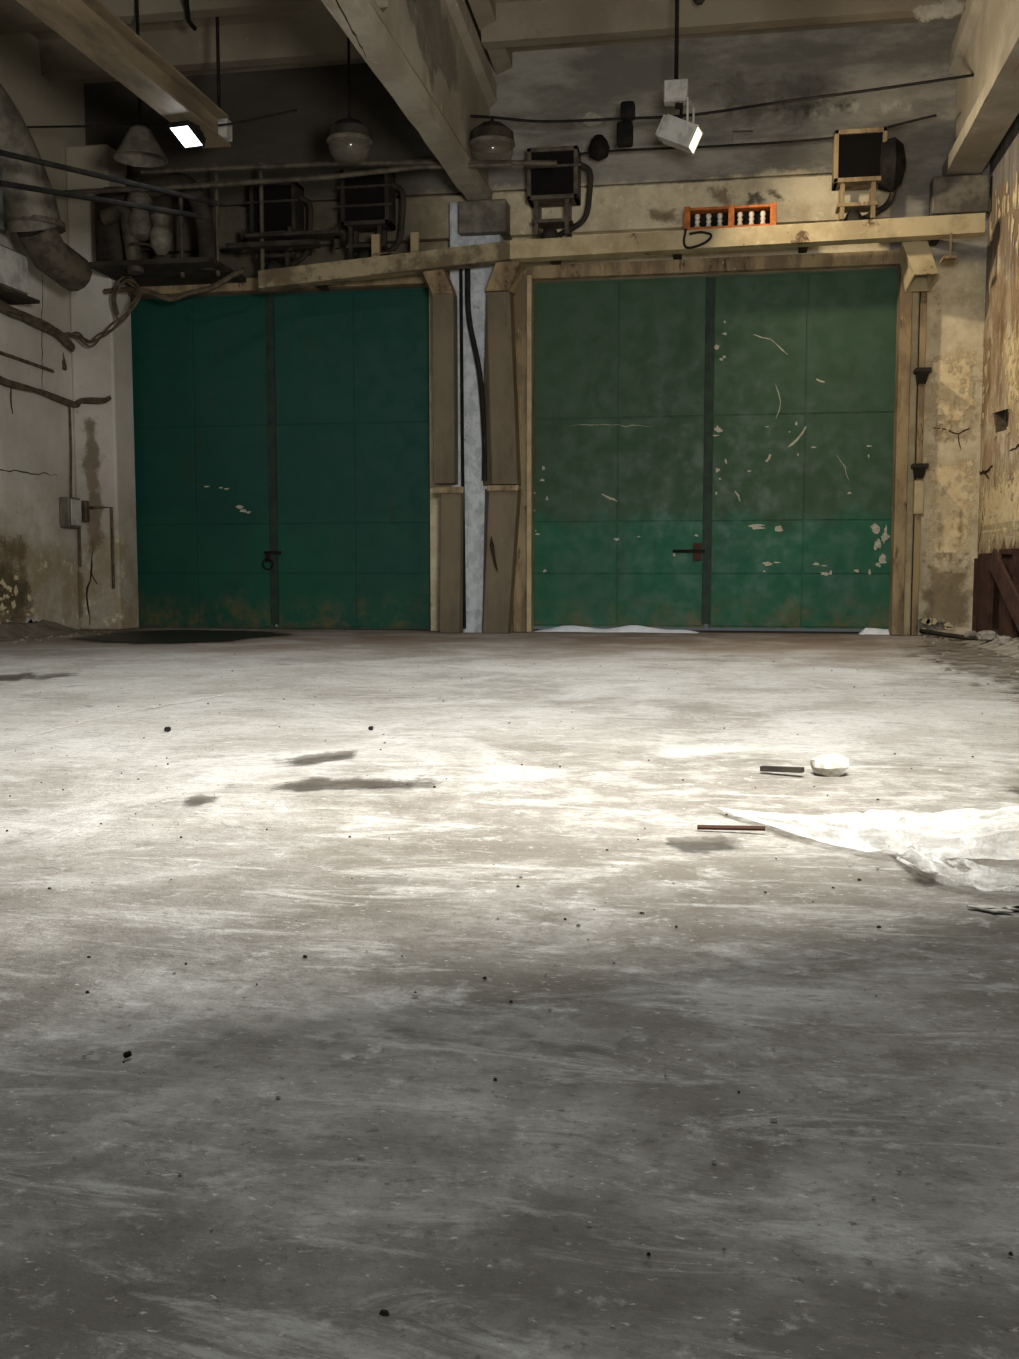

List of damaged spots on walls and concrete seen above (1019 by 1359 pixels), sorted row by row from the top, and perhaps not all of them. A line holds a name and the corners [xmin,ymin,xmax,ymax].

peeling [989,171,1019,256]
flaking render [922,323,1019,571]
crack [933,427,1019,548]
peeling [749,524,783,532]
peeling [854,523,890,575]
flaking render [0,570,40,623]
water stain [72,630,290,644]
spalling [918,618,953,635]